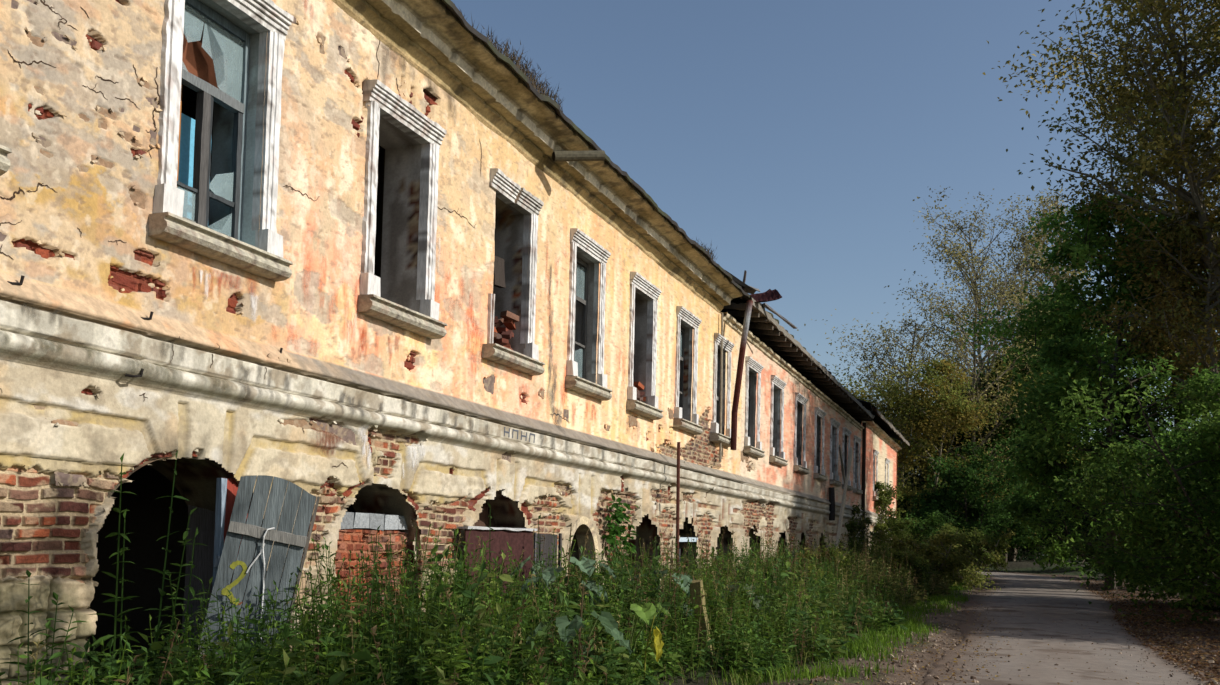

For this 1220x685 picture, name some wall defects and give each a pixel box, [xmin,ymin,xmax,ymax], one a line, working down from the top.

crack [41,0,89,30]
flaking render [24,27,107,51]
flaking render [28,86,160,159]
crack [0,182,56,259]
flaking render [0,232,75,260]
flaking render [108,248,172,300]
flaking render [404,351,416,371]
flaking render [628,407,721,469]
flaking render [0,452,172,584]
flaking render [278,418,428,568]
flaking render [521,484,576,546]
flaking render [592,476,714,567]